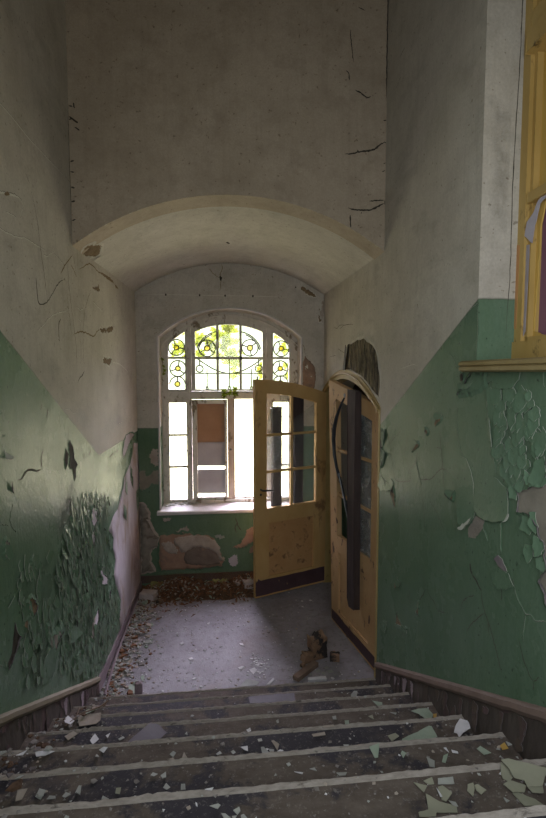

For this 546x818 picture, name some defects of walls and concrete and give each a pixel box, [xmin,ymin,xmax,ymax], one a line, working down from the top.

crack [347,0,389,98]
crack [346,142,386,172]
crack [349,200,384,227]
crack [27,178,118,341]
spalling [81,241,104,262]
spalling [343,335,382,401]
peeling [444,372,546,608]
peeling [0,432,253,757]
peeling [35,785,82,800]